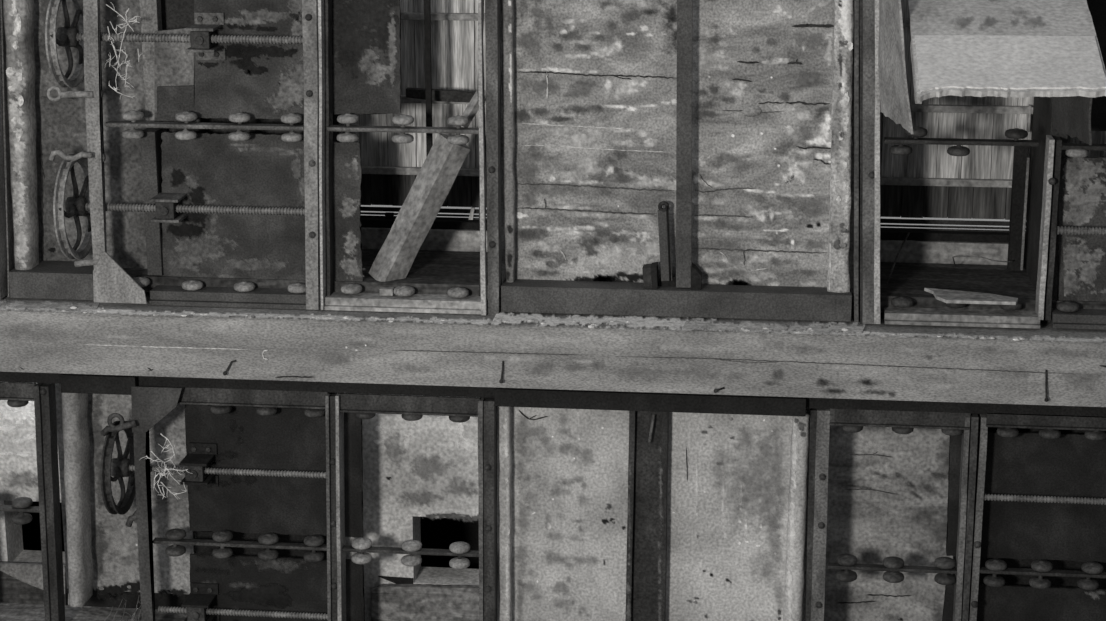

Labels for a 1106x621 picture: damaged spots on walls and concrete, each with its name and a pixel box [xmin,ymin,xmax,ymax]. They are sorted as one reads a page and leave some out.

peeling [224,0,304,113]
peeling [358,10,397,88]
crack [522,71,673,80]
leakage [692,28,747,116]
leakage [772,2,828,19]
leakage [515,0,677,276]
crack [516,175,756,218]
leakage [692,93,831,286]
peeling [1062,157,1106,296]
leakage [517,419,591,526]
leakage [548,555,595,616]